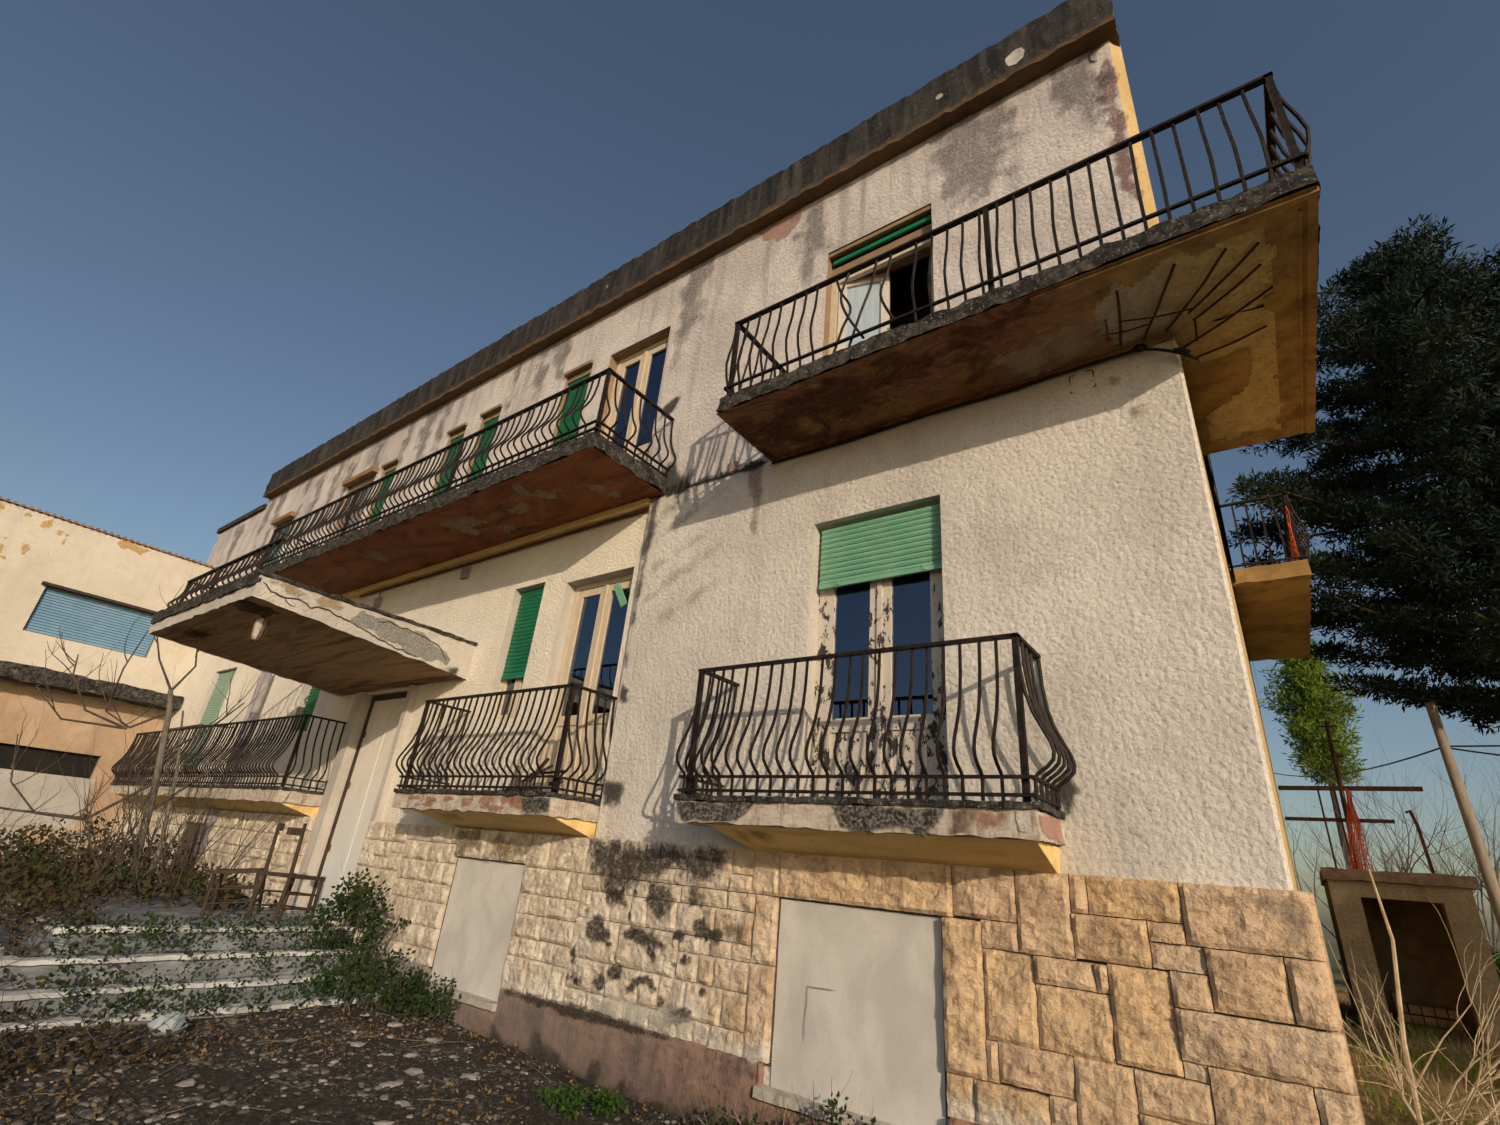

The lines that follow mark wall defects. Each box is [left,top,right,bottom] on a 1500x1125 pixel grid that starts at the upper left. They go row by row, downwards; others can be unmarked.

water stain [1052,49,1104,121]
water stain [936,100,1016,195]
spalling [1092,226,1285,443]
water stain [655,464,689,496]
crack [264,582,446,662]
water stain [505,835,744,1084]